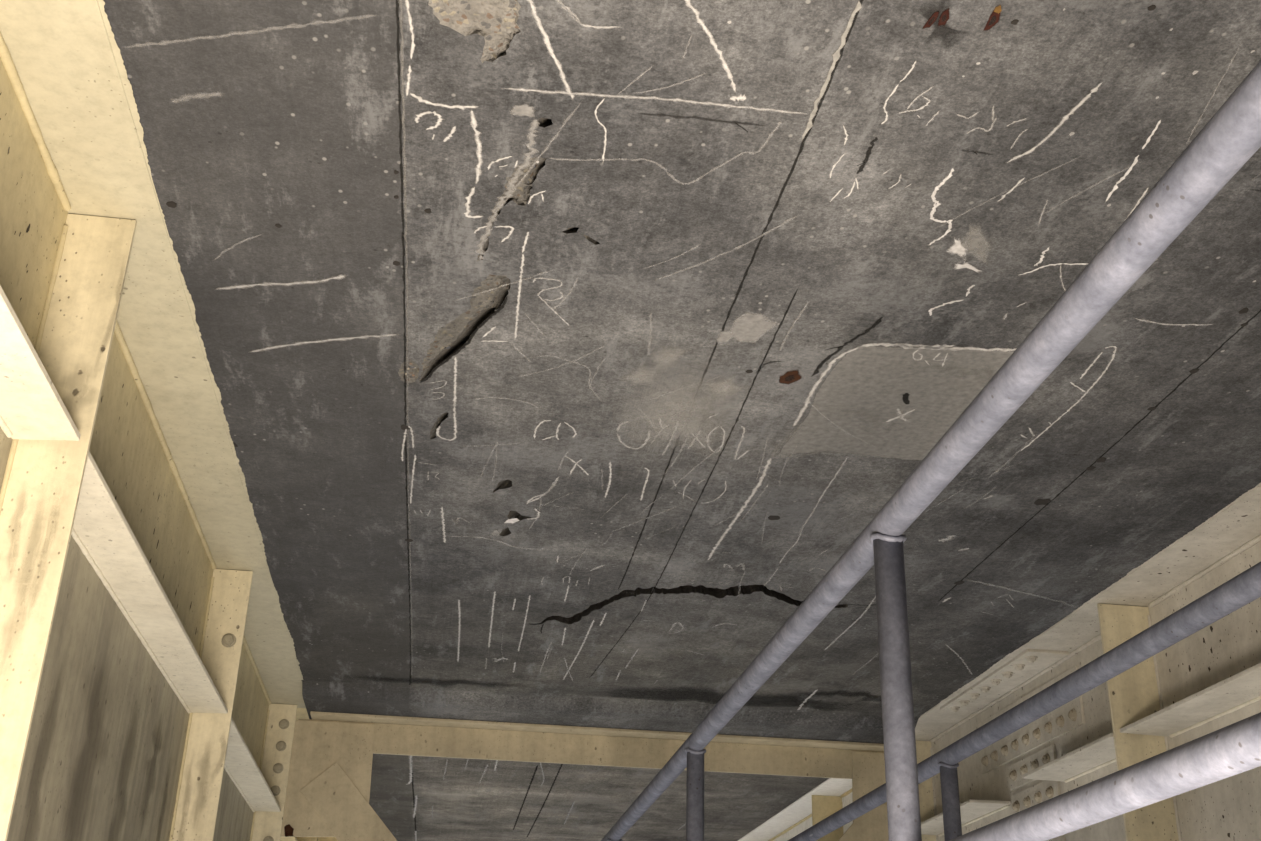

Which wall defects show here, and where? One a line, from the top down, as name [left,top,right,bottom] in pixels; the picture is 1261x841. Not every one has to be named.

spalling [428,0,521,63]
rust [923,9,949,29]
rust [984,5,1002,31]
spalling [476,105,548,262]
spalling [398,275,511,383]
crack [529,580,803,633]
crack [834,602,869,610]